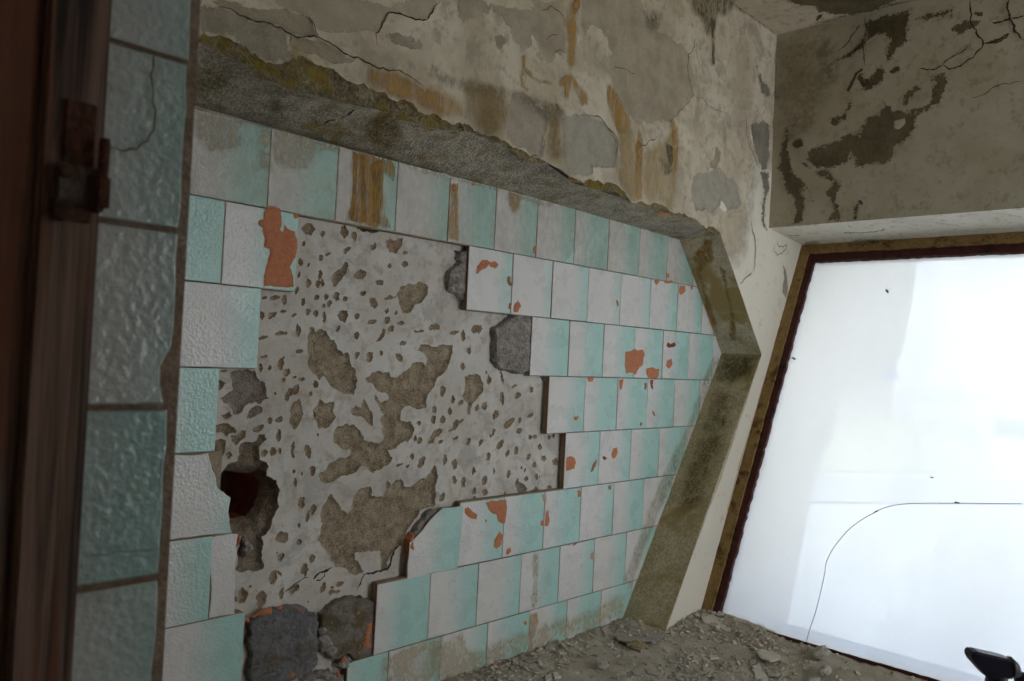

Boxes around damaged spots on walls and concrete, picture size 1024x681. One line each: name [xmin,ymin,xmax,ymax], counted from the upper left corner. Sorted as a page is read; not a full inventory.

crack [215,1,440,86]
rust [349,152,395,227]
spalling [200,0,741,234]
rust [550,0,587,158]
rust [608,87,678,207]
flaking render [756,65,770,97]
crack [839,19,867,66]
leakage [783,0,954,130]
crack [920,0,1023,70]
spalling [215,206,576,608]
peeling [619,342,676,389]